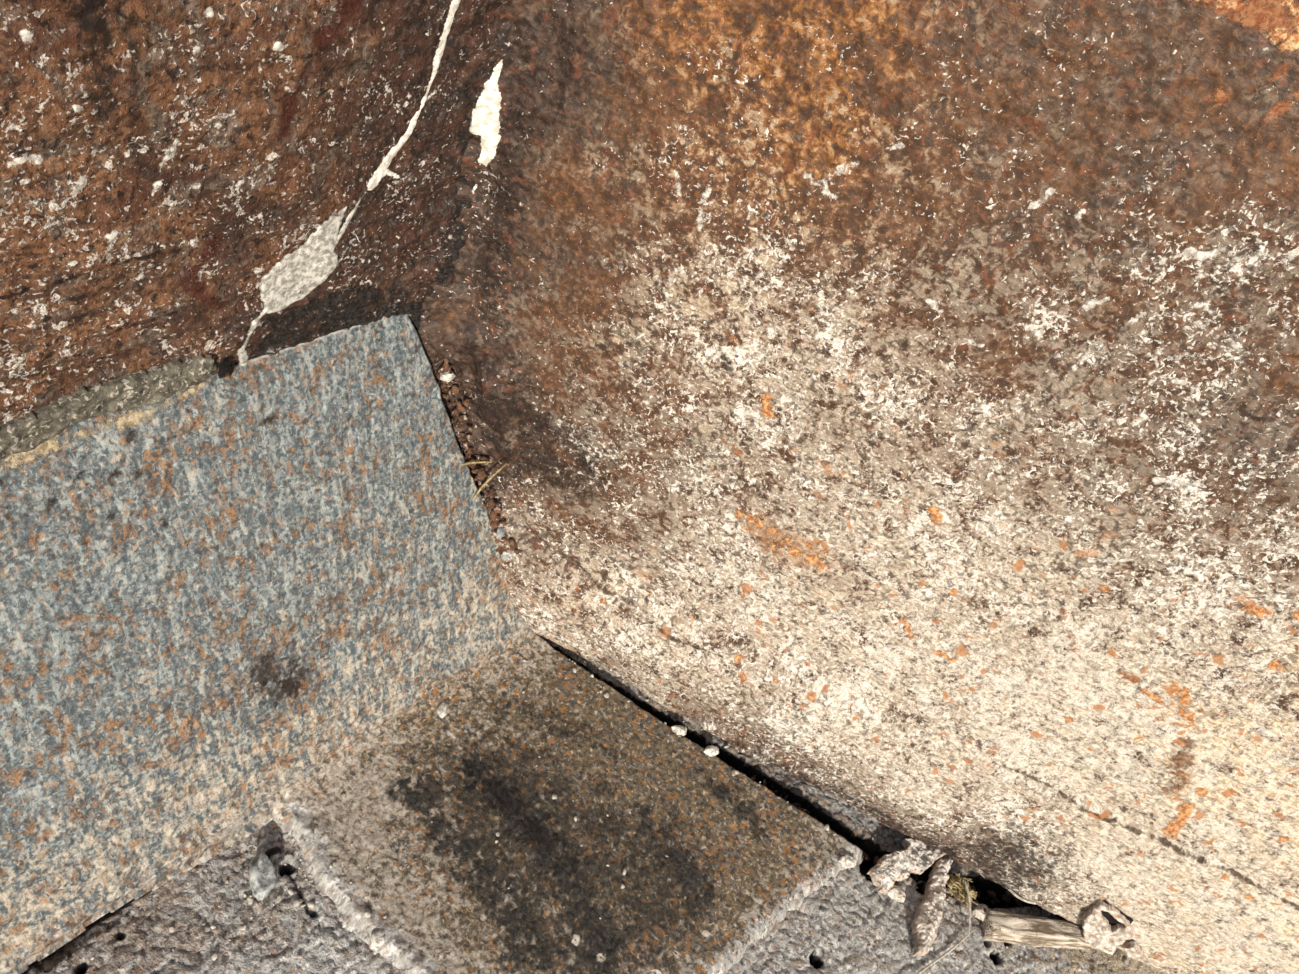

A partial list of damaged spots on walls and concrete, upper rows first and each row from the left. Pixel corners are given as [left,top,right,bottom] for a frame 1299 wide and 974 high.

peeling [20,29,33,42]
rust [1188,0,1299,81]
rust [1266,92,1299,118]
peeling [7,154,43,168]
peeling [152,139,178,196]
rust [178,233,221,309]
rust [761,393,775,418]
crack [543,638,1038,909]
damp [388,778,575,973]
damp [463,754,626,974]
peeling [867,838,964,956]
peeling [1082,899,1144,961]